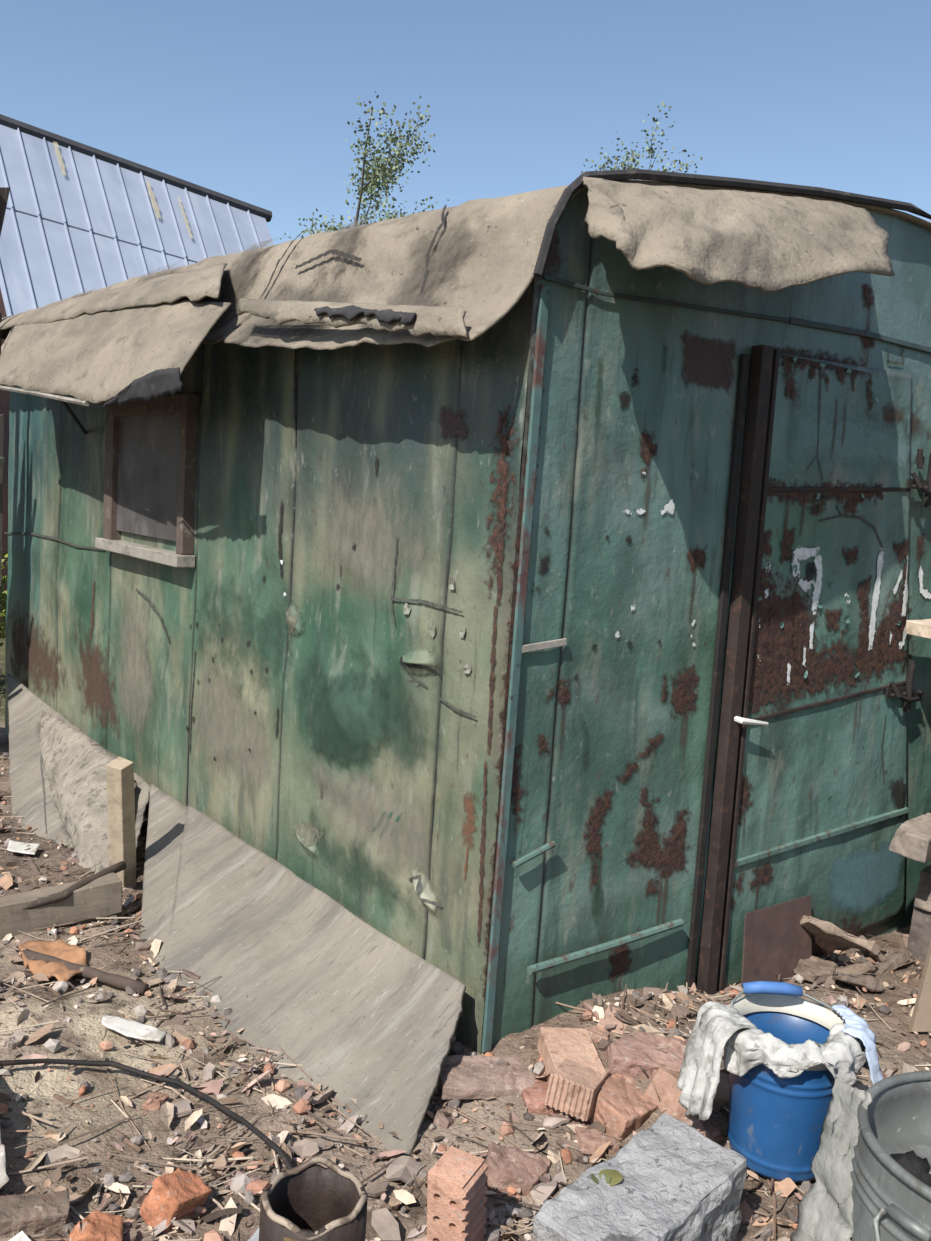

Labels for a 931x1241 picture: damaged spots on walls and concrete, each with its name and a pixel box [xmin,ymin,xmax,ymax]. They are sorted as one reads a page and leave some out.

rust [682,331,736,392]
rust [774,336,929,453]
rust [687,547,706,571]
rust [748,478,925,716]
rust [10,611,63,696]
rust [79,583,119,736]
rust [462,405,540,998]
rust [546,679,571,727]
rust [661,664,699,746]
rust [583,733,691,919]
rust [730,862,774,910]
rust [607,945,632,980]